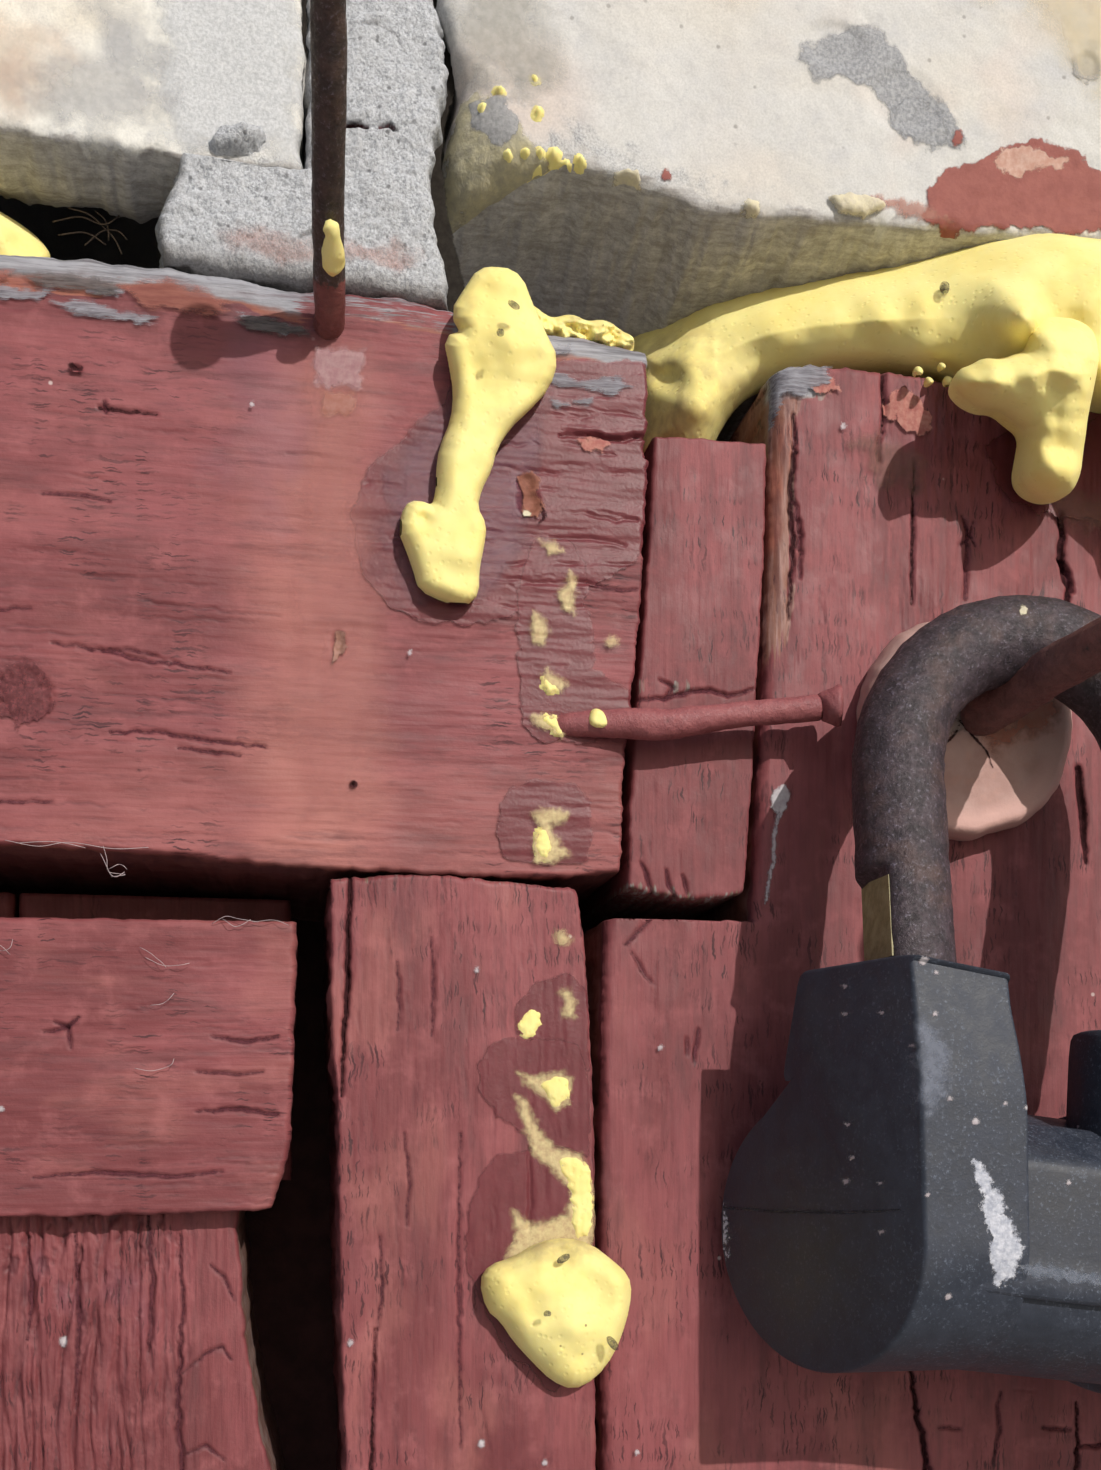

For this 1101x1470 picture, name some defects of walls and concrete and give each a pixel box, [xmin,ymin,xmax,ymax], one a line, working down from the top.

spalling [799,25,965,152]
peeling [995,145,1069,178]
peeling [0,269,315,337]
peeling [811,378,841,393]
peeling [883,387,933,436]
leakage [350,359,649,744]
crack [788,413,802,619]
crack [1056,517,1071,602]
leakage [496,779,593,865]
leakage [465,973,592,1392]
crack [909,1371,959,1470]
crack [1042,1401,1101,1470]